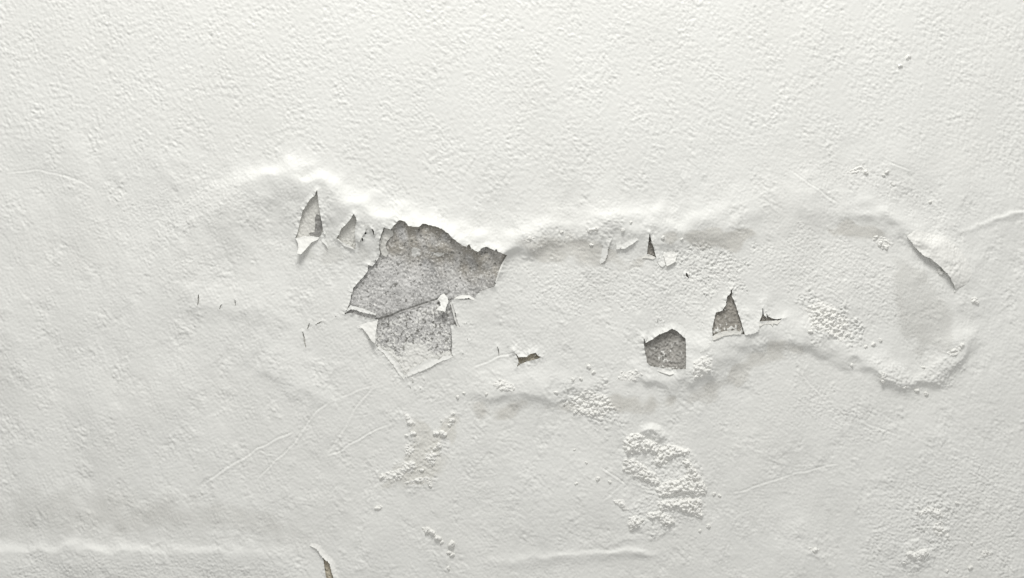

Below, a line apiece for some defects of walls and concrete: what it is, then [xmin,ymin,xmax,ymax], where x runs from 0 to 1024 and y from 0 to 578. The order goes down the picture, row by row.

peeling [290,185,515,386]
peeling [617,281,790,382]
peeling [485,344,550,396]
flaking render [570,364,615,419]
peeling [310,543,338,578]